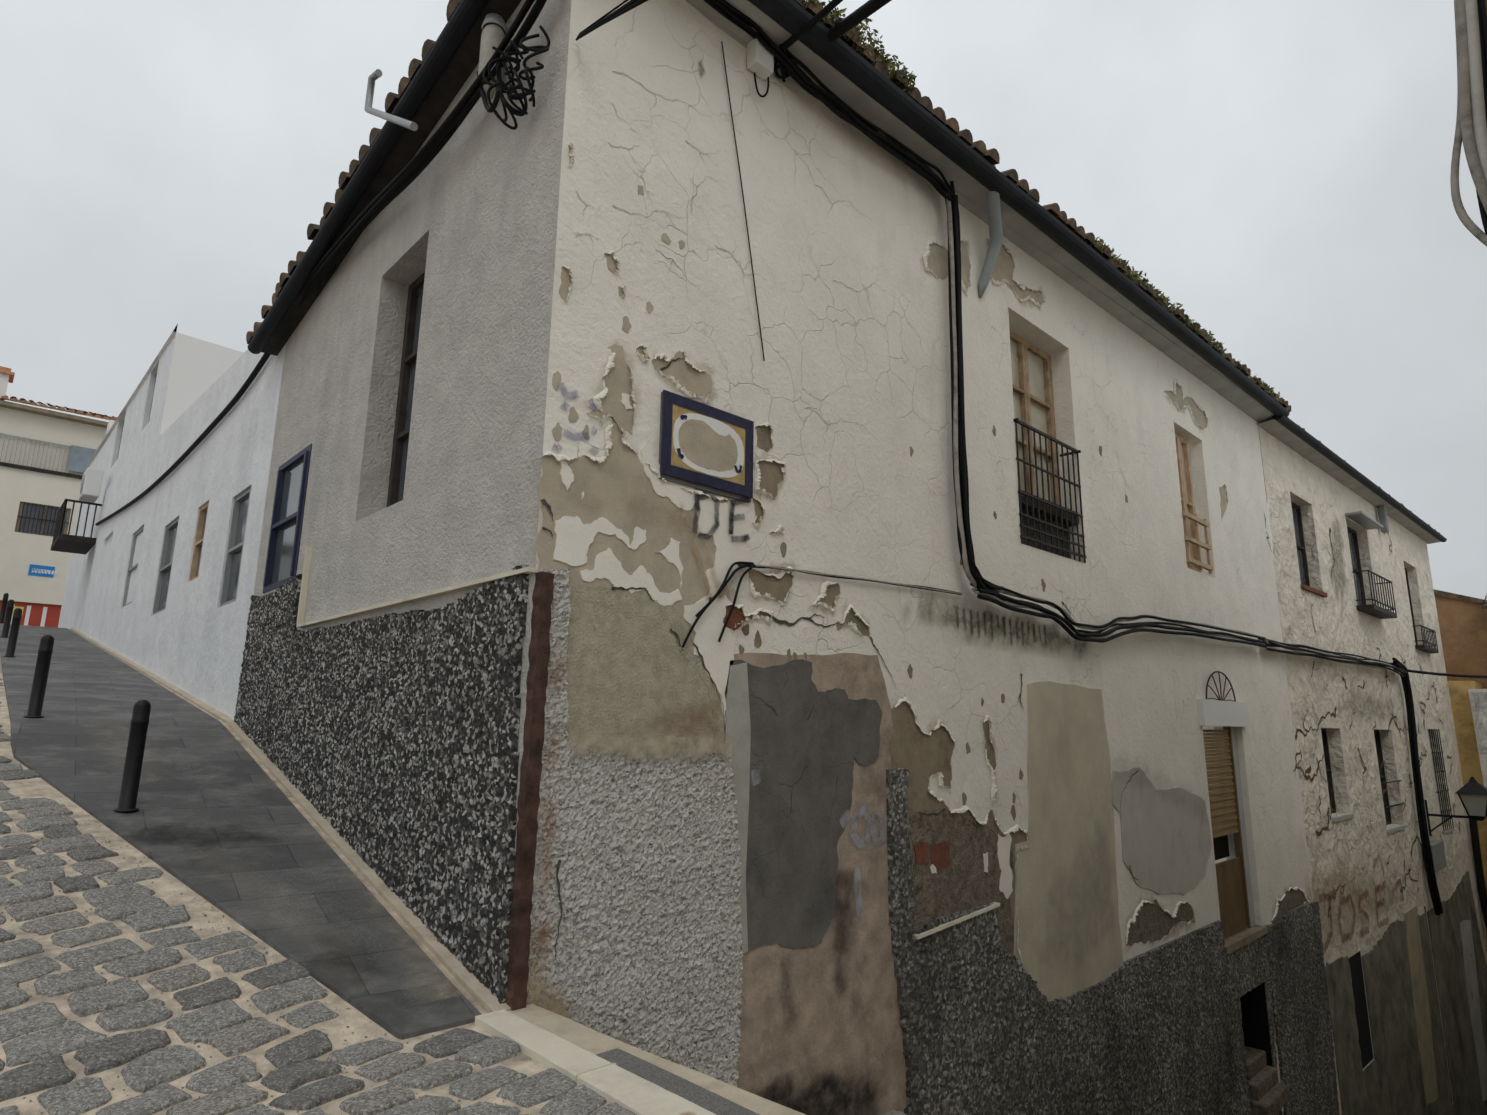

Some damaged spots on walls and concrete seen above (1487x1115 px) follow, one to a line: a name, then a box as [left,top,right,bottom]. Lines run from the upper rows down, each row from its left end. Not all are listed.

crack [575,71,718,284]
peeling [559,266,574,302]
peeling [604,250,626,298]
peeling [923,224,971,297]
peeling [987,239,1045,307]
peeling [1164,380,1208,430]
peeling [535,316,794,725]
crack [772,614,893,680]
leakage [923,600,1087,652]
peeling [889,694,1030,963]
peeling [1126,899,1196,946]
leakage [760,1074,875,1115]